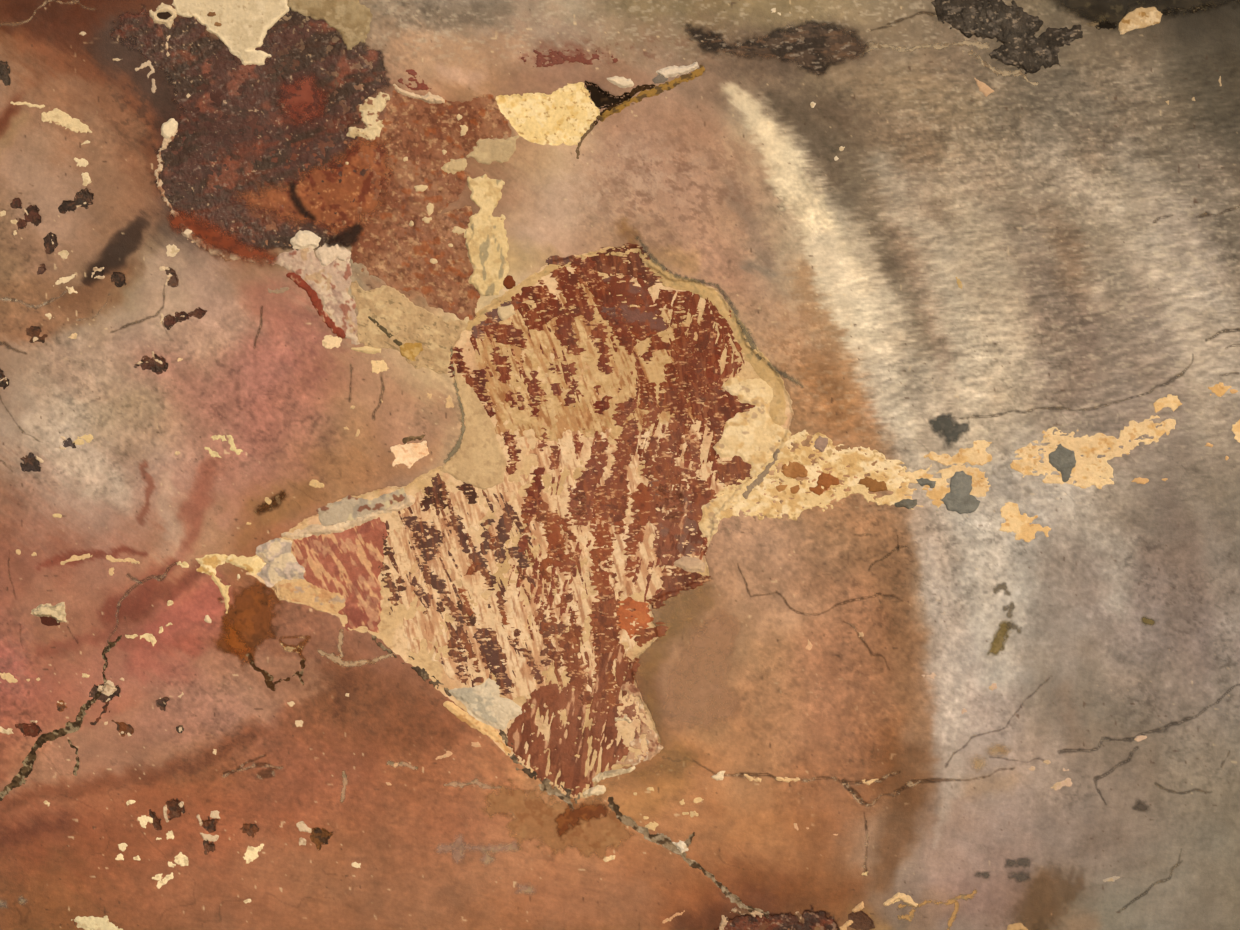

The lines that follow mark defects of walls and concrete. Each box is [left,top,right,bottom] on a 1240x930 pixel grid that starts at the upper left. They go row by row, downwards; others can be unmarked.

peeling [110,0,994,804]
peeling [1010,394,1182,489]
peeling [999,502,1051,542]
corrosion [217,583,280,664]
crack [0,563,177,801]
crack [538,784,574,810]
peeling [679,797,704,817]
peeling [1028,760,1072,791]
crack [608,797,770,919]
crack [898,890,977,930]